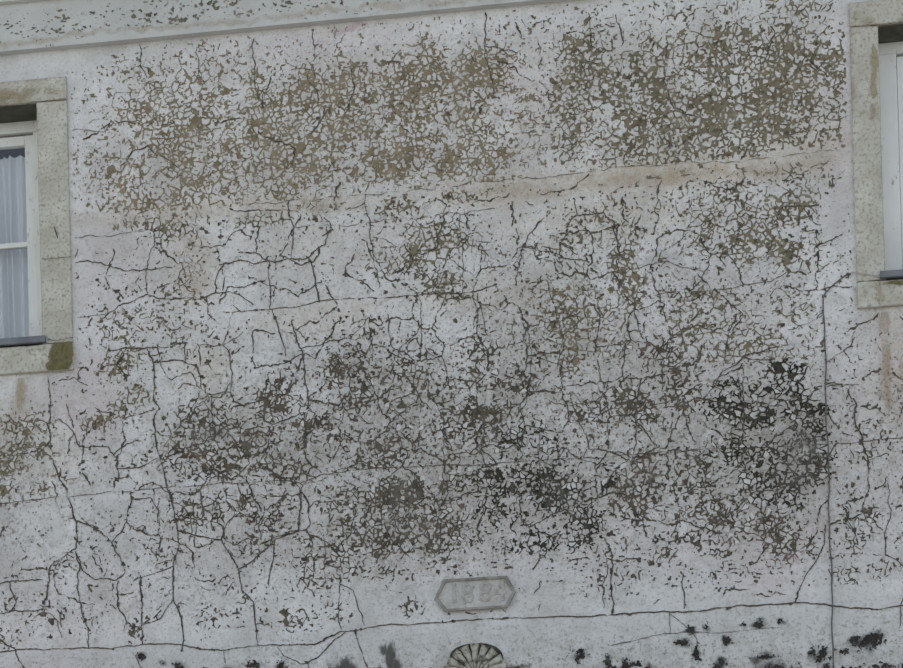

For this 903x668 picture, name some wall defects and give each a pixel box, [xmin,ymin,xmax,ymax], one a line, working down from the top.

crack [72,44,147,132]
spalling [0,0,389,46]
crack [251,39,260,99]
crack [484,12,518,84]
peeling [91,249,146,302]
crack [0,150,903,668]
peeling [825,475,888,586]
peeling [0,518,152,651]
leakage [566,649,590,664]
leakage [604,653,651,668]
leakage [673,621,728,668]
leakage [749,628,903,668]